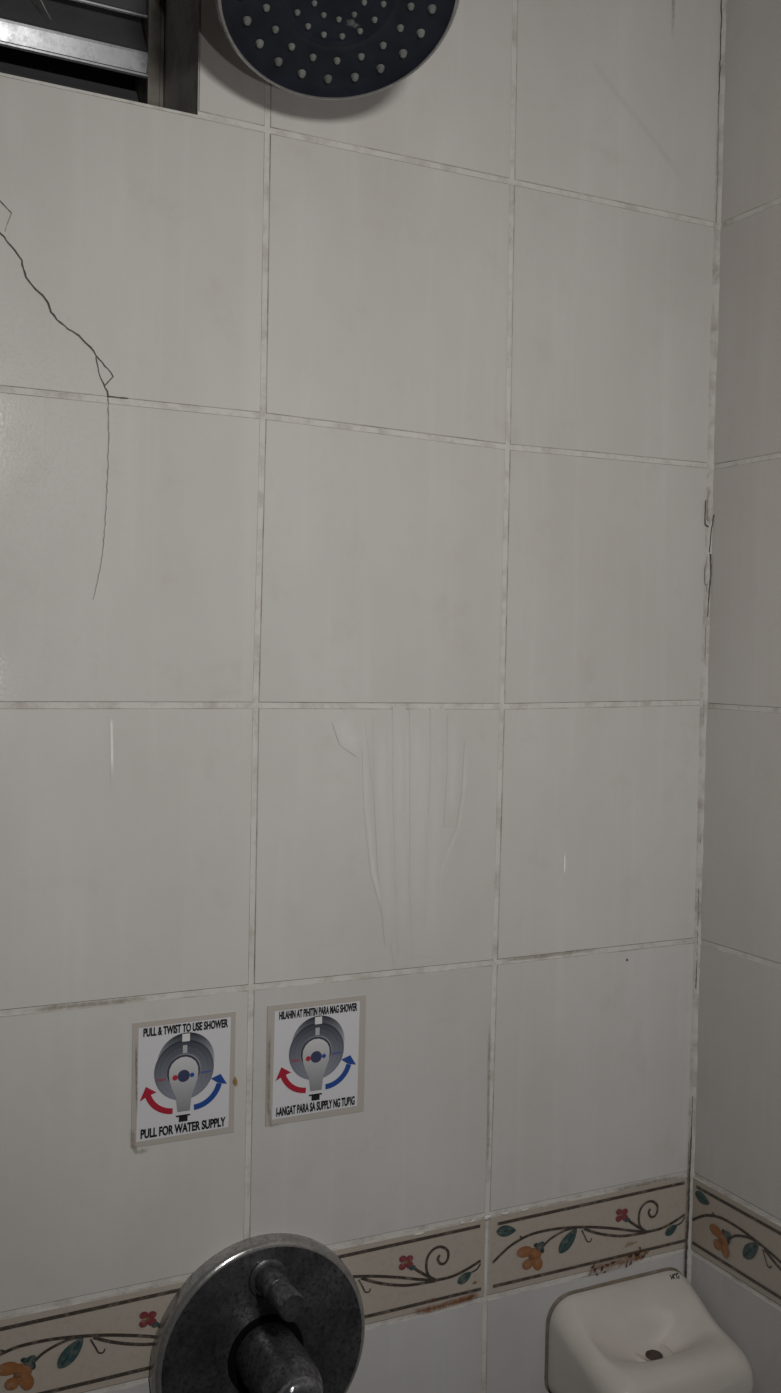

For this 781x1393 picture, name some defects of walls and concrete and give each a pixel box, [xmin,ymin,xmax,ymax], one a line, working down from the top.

crack [0,201,126,599]
rust [589,1247,647,1276]
rust [421,1282,477,1312]